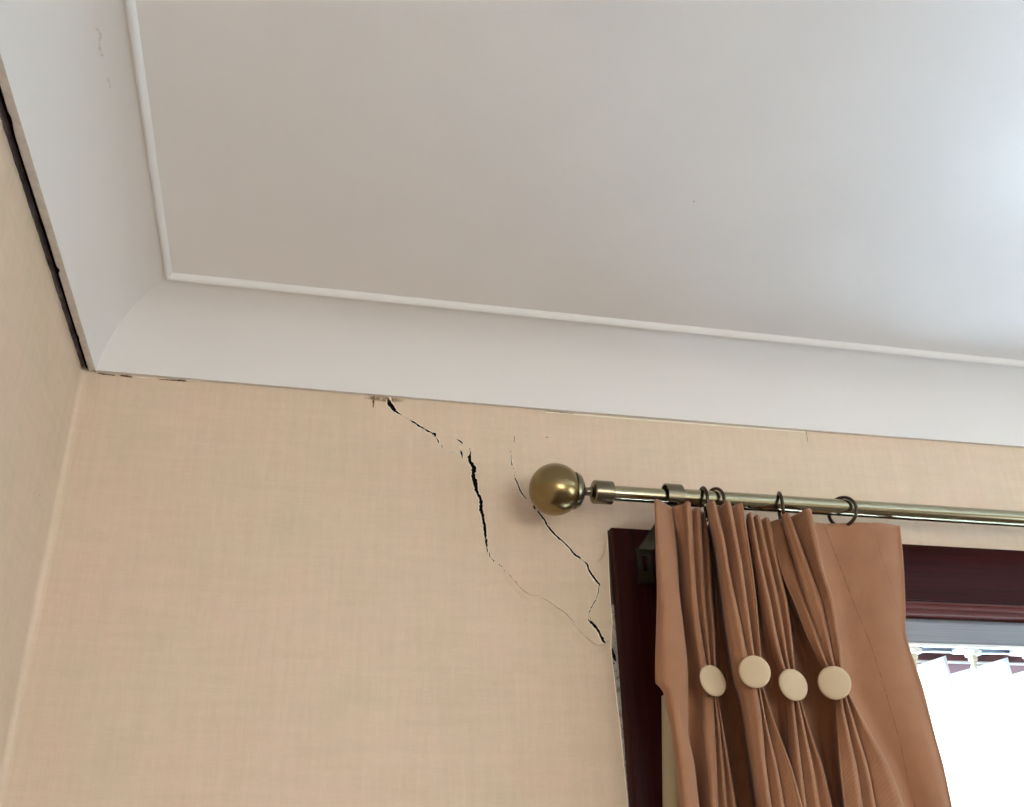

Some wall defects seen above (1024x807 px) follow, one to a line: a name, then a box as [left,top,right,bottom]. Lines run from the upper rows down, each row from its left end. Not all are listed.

crack [386,397,517,583]
crack [510,436,606,644]